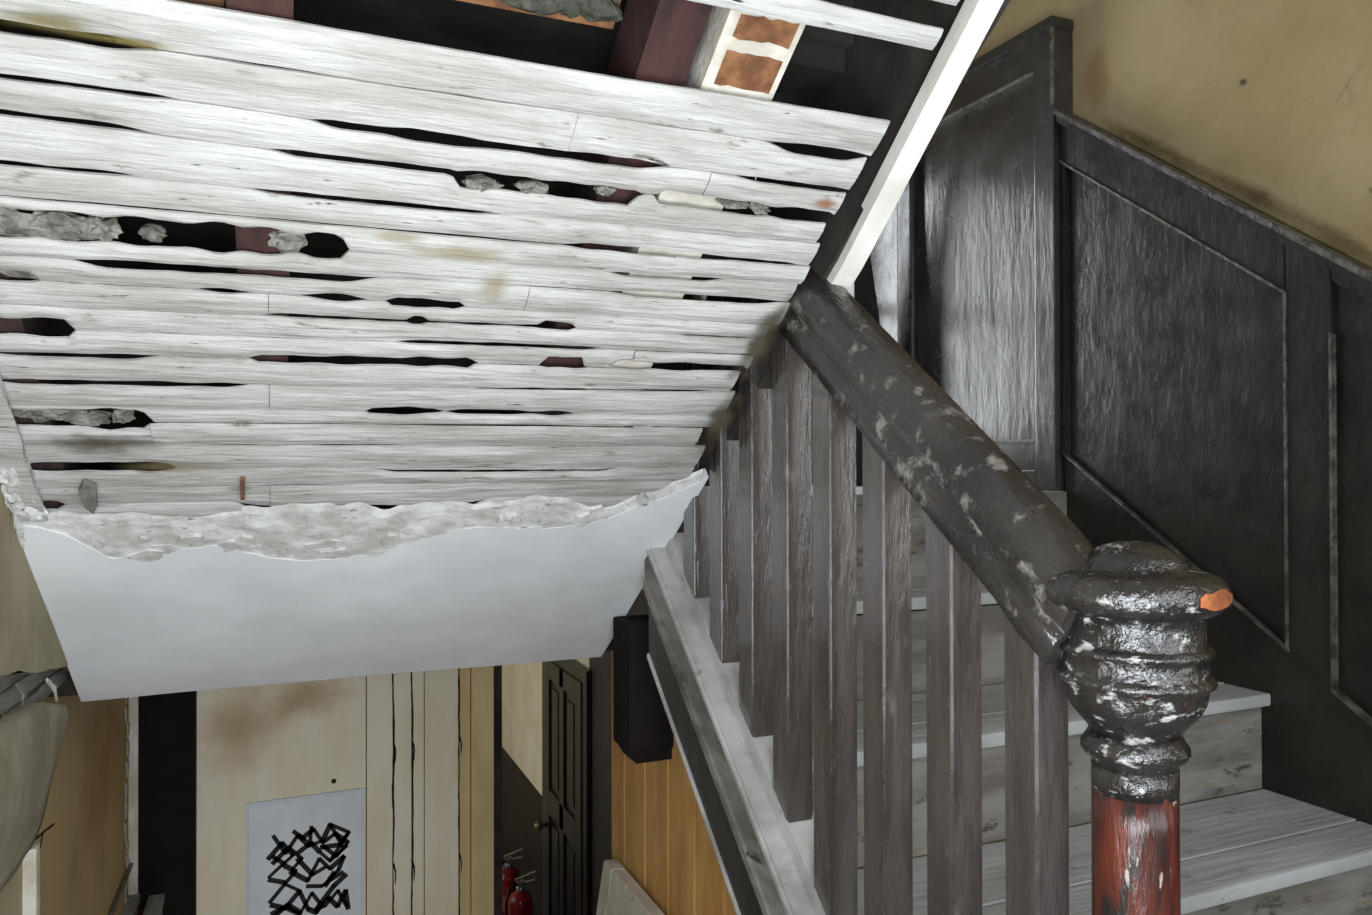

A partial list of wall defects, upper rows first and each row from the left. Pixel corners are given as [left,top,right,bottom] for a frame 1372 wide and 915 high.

peeling [714,14,800,94]
flaking render [0,467,703,562]